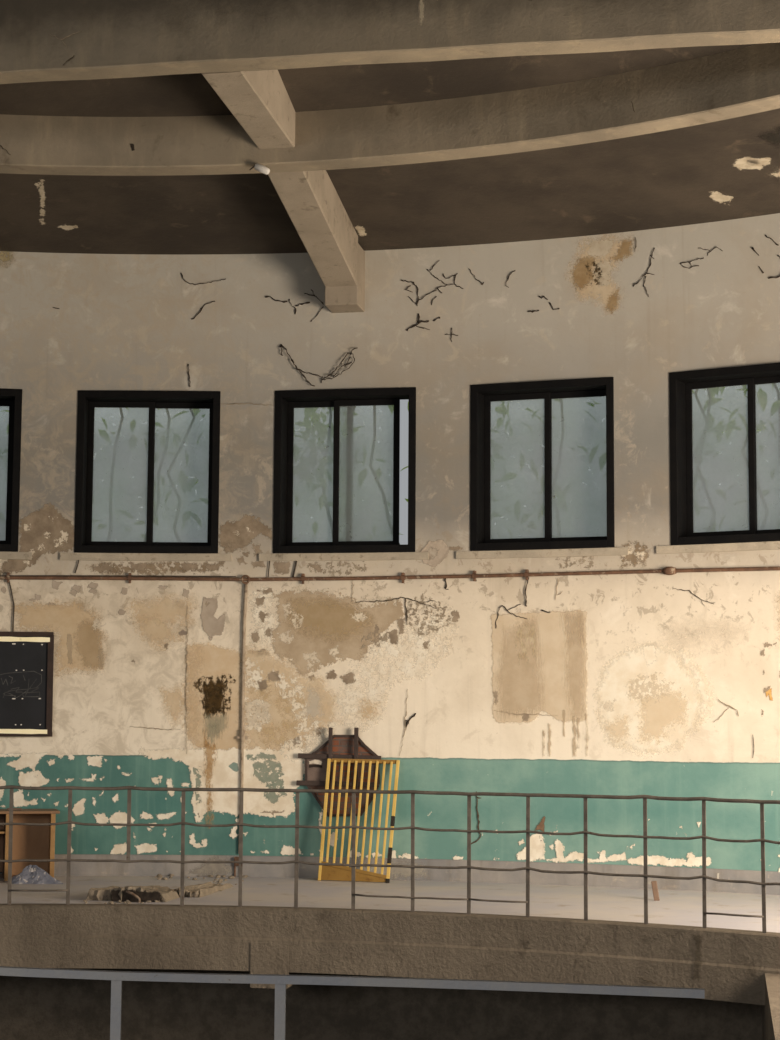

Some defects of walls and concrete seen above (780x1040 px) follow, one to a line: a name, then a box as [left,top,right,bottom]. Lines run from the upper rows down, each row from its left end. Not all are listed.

peeling [734,157,780,178]
spalling [34,179,46,225]
leakage [571,239,633,311]
peeling [52,514,291,596]
peeling [308,561,367,575]
leakage [132,598,336,751]
leakage [491,610,712,755]
peeling [0,584,460,856]
peeling [350,850,426,859]
crack [471,791,481,844]
peeling [516,816,711,867]